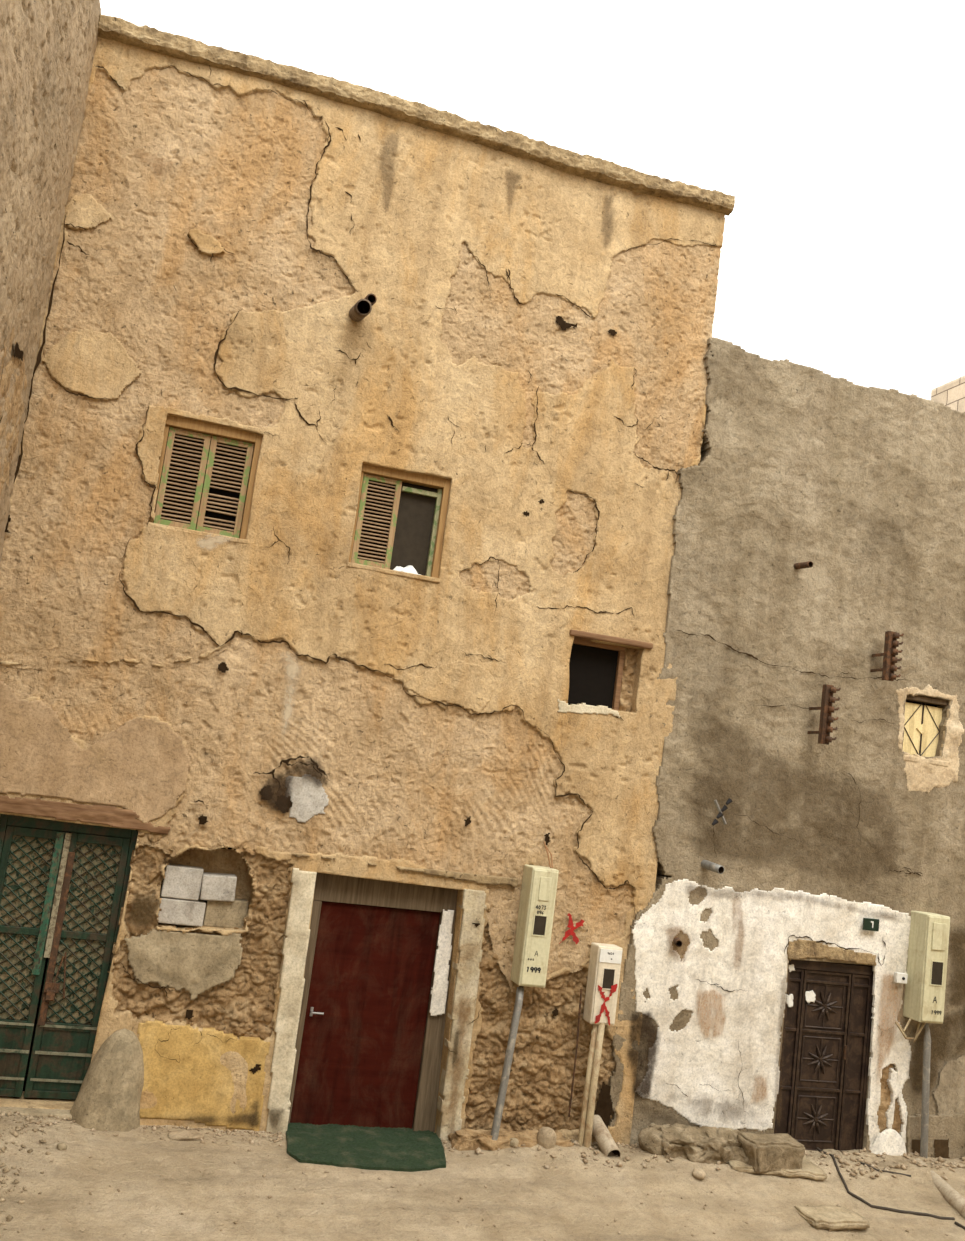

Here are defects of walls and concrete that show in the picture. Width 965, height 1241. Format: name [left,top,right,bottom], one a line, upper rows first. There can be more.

crack [265,89,361,291]
spalling [0,67,634,1132]
crack [119,406,636,913]
peeling [672,886,718,960]
peeling [669,986,692,1031]
spalling [877,1064,902,1133]
peeling [933,1055,965,1115]